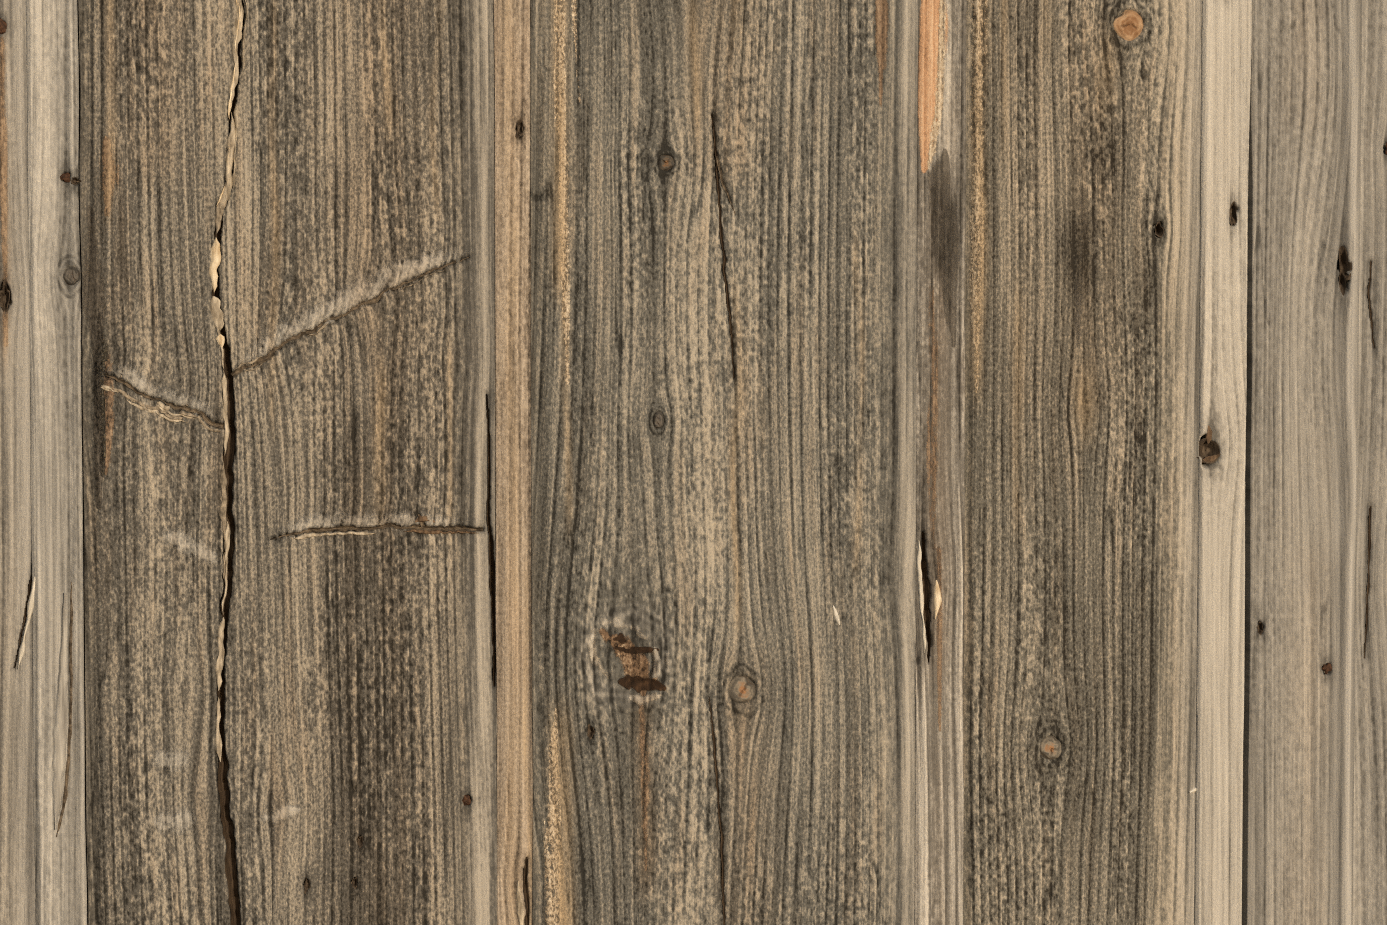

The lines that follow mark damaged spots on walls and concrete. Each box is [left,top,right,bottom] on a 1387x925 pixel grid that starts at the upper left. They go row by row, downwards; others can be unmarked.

crack [711,114,735,378]
crack [101,0,496,925]
crack [916,533,942,663]